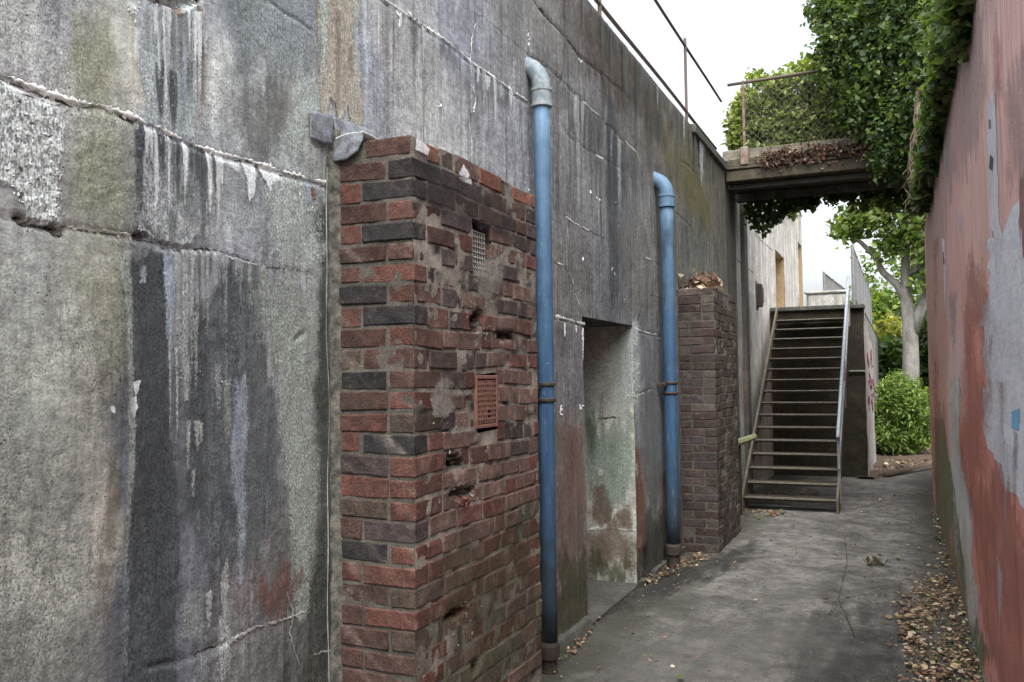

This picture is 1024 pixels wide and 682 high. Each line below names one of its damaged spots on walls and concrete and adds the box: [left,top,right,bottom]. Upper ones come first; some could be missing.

peeling [0,79,68,238]
crack [0,72,326,195]
leakage [120,0,363,682]
spalling [465,300,511,339]
peeling [980,84,1024,523]
leakage [579,323,641,526]
crack [174,592,331,666]
crack [739,520,882,637]